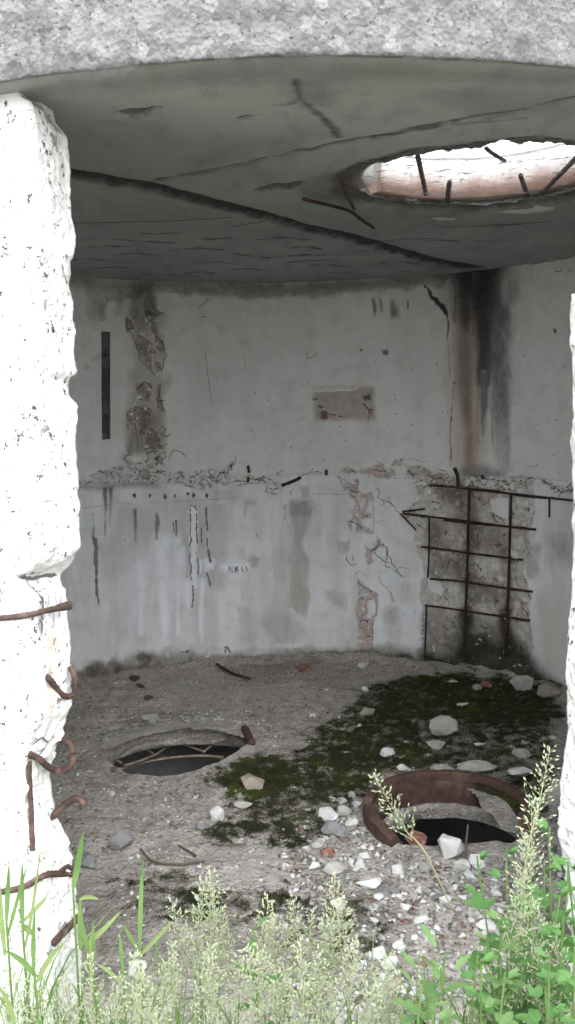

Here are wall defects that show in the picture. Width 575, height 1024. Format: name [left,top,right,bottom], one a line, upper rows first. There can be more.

crack [293,81,459,150]
peeling [79,310,301,608]
damp [70,481,421,685]
damp [118,267,523,477]
spalling [323,458,573,667]
crack [346,458,573,646]
damp [76,524,574,1024]